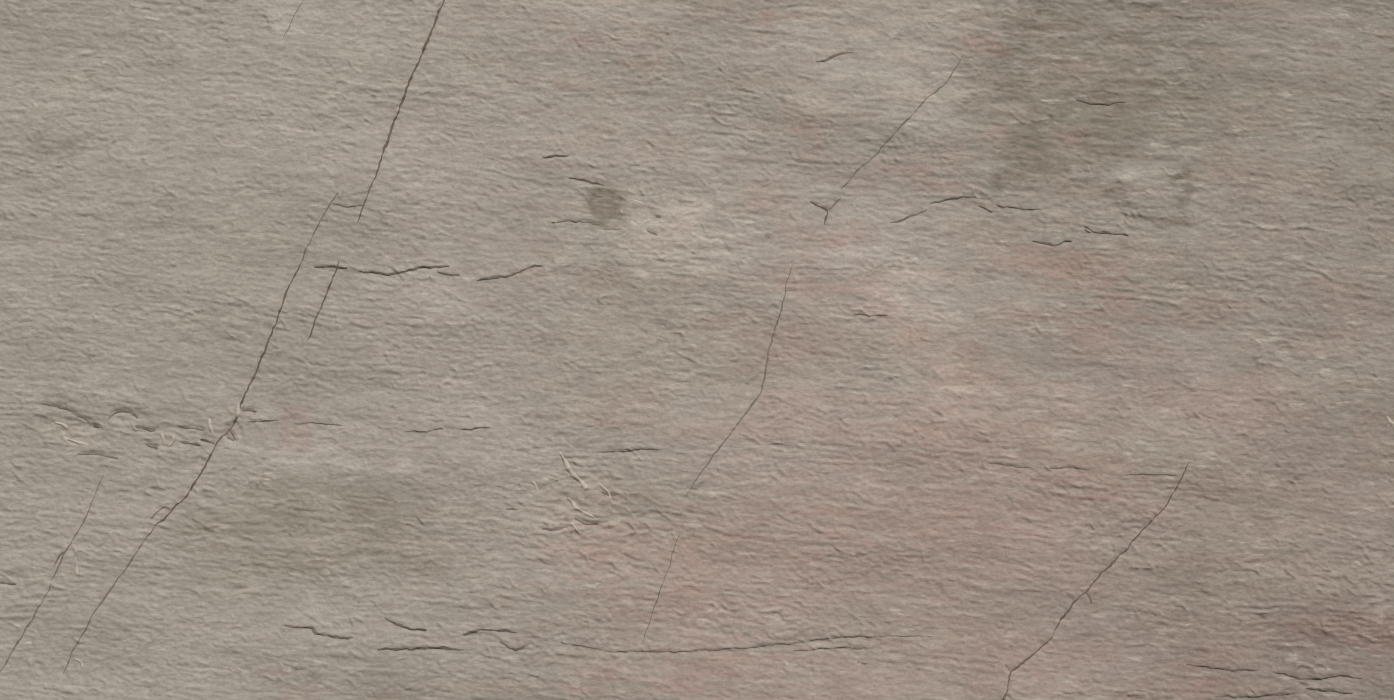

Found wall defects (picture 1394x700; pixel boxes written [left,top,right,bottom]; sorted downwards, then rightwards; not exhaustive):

crack [816,52,853,62]
crack [810,54,965,225]
crack [63,0,542,674]
crack [597,446,659,454]
crack [685,265,793,497]
crack [854,310,887,318]
crack [562,532,931,653]
crack [988,462,1189,700]